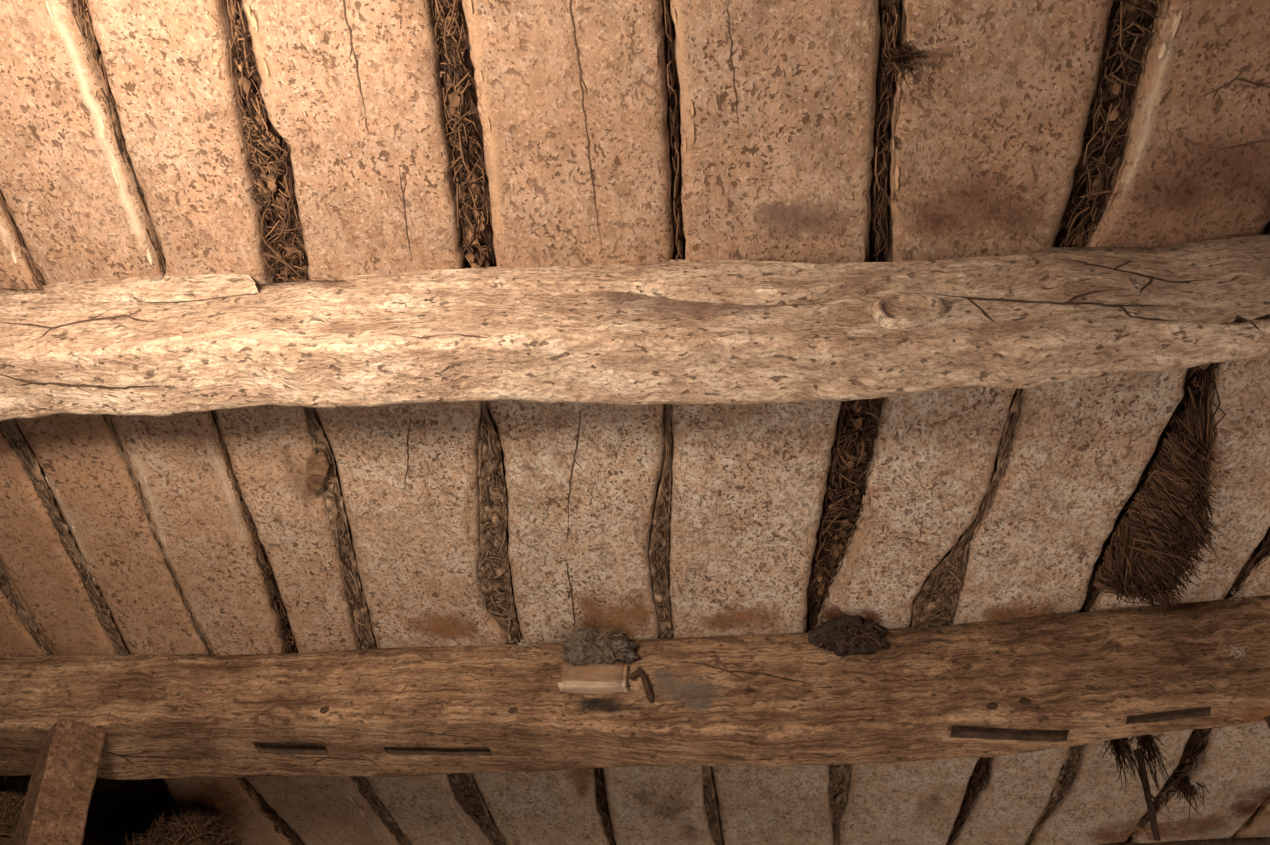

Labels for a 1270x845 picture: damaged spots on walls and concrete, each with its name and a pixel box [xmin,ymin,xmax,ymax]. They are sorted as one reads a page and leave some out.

crack [924,259,1213,323]
crack [0,312,157,339]
crack [1221,314,1270,331]